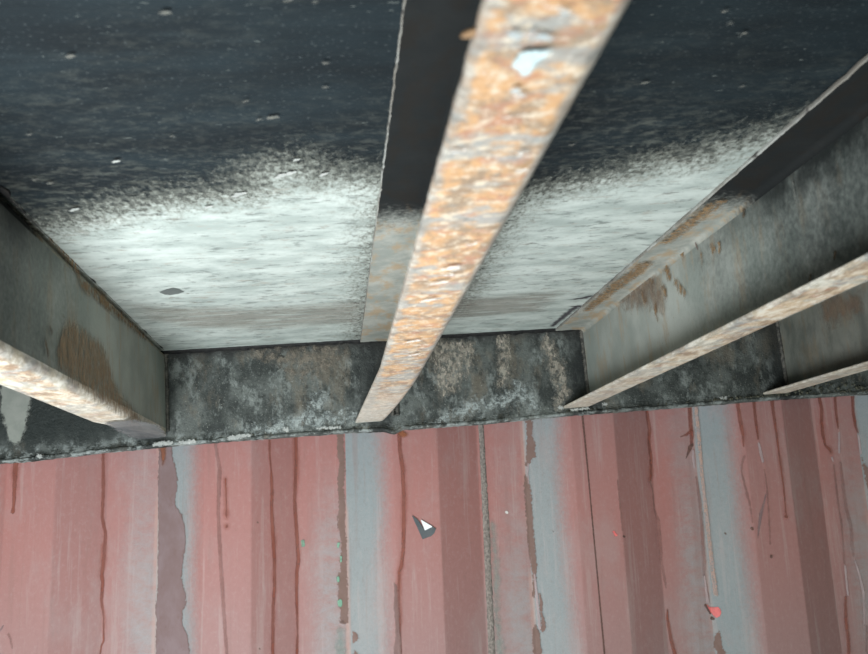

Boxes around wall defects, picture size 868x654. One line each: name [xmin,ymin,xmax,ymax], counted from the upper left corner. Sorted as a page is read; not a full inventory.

corrosion [584,262,686,321]
corrosion [45,315,138,422]
leakage [245,393,357,434]
leakage [429,339,474,396]
leakage [438,335,538,421]
leakage [543,296,592,409]
peeling [152,439,196,654]
corrosion [268,439,276,654]
corrosion [397,431,407,653]
peeling [524,420,546,654]
corrosion [681,407,718,604]
peeling [713,631,726,654]